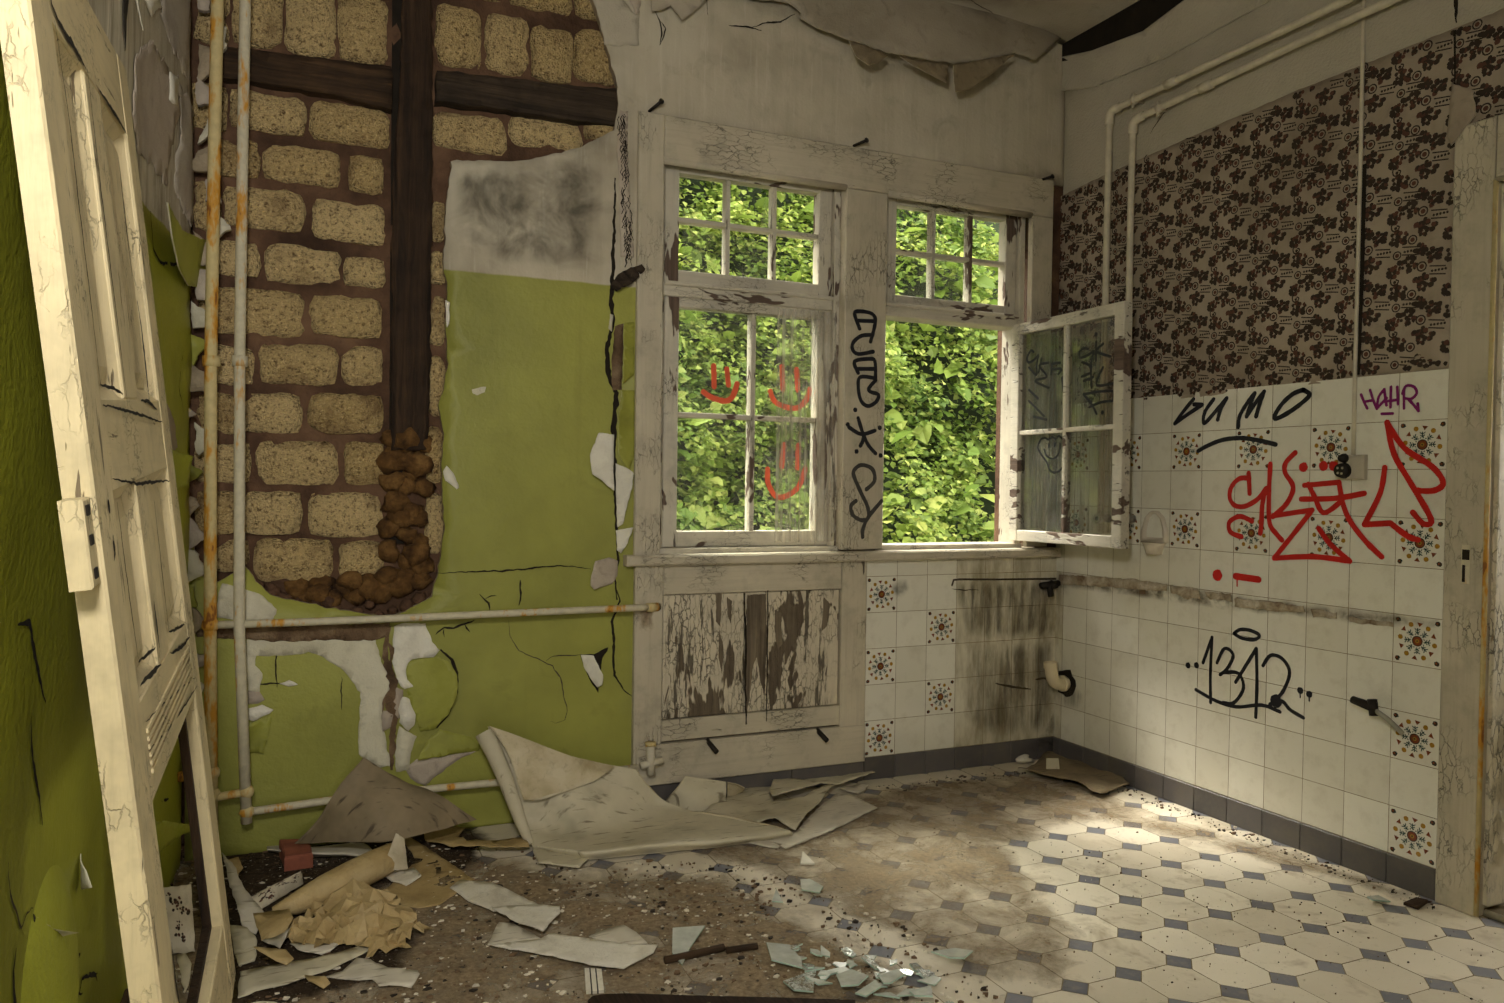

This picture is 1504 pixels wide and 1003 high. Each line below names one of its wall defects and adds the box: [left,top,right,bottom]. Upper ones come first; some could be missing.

flaking render [132,0,641,786]
crack [436,110,634,723]
crack [260,655,279,685]
crack [382,626,398,770]
peeling [715,593,797,713]
peeling [821,598,831,631]